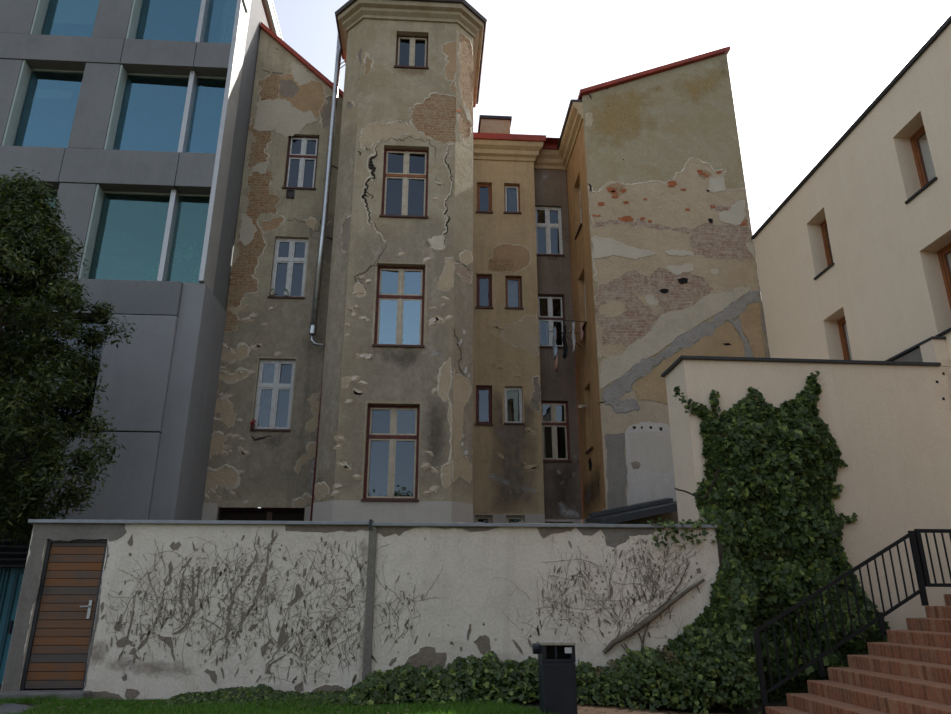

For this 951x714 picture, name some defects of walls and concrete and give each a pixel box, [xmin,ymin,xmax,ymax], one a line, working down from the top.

flaking render [359,32,474,150]
flaking render [204,62,332,505]
flaking render [302,215,351,267]
crack [353,119,472,295]
flaking render [588,157,770,404]
peeling [341,375,368,405]
peeling [420,357,472,495]